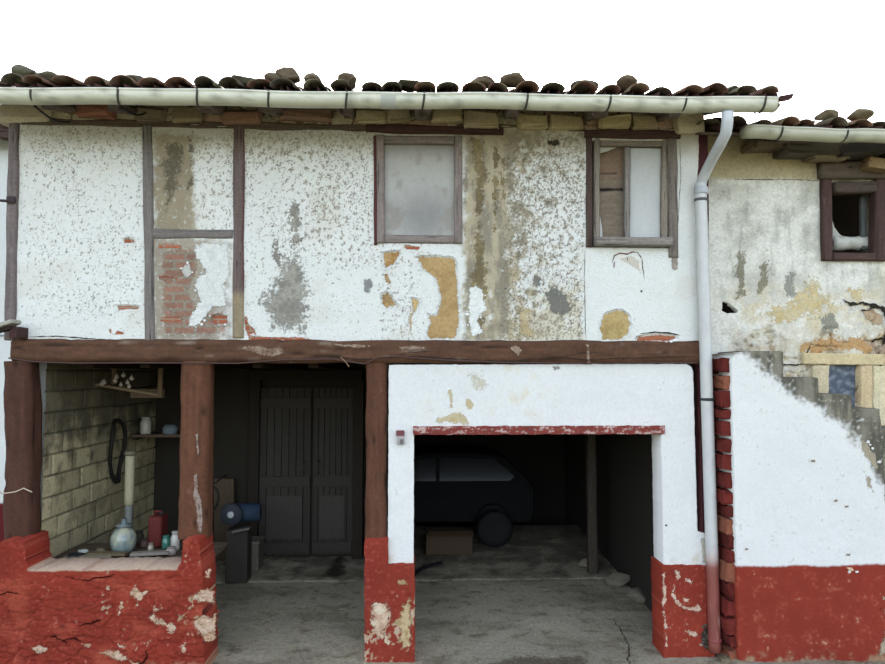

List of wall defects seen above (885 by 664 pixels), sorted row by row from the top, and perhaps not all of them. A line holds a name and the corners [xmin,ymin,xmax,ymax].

leakage [469,137,510,300]
peeling [159,242,231,328]
leakage [258,200,311,334]
spalling [379,244,487,340]
leakage [533,275,571,315]
spalling [599,310,675,343]
leakage [735,251,747,299]
crack [843,299,885,366]
crack [50,619,101,644]
peeling [188,569,220,642]
peeling [366,579,416,654]
crack [613,618,635,664]